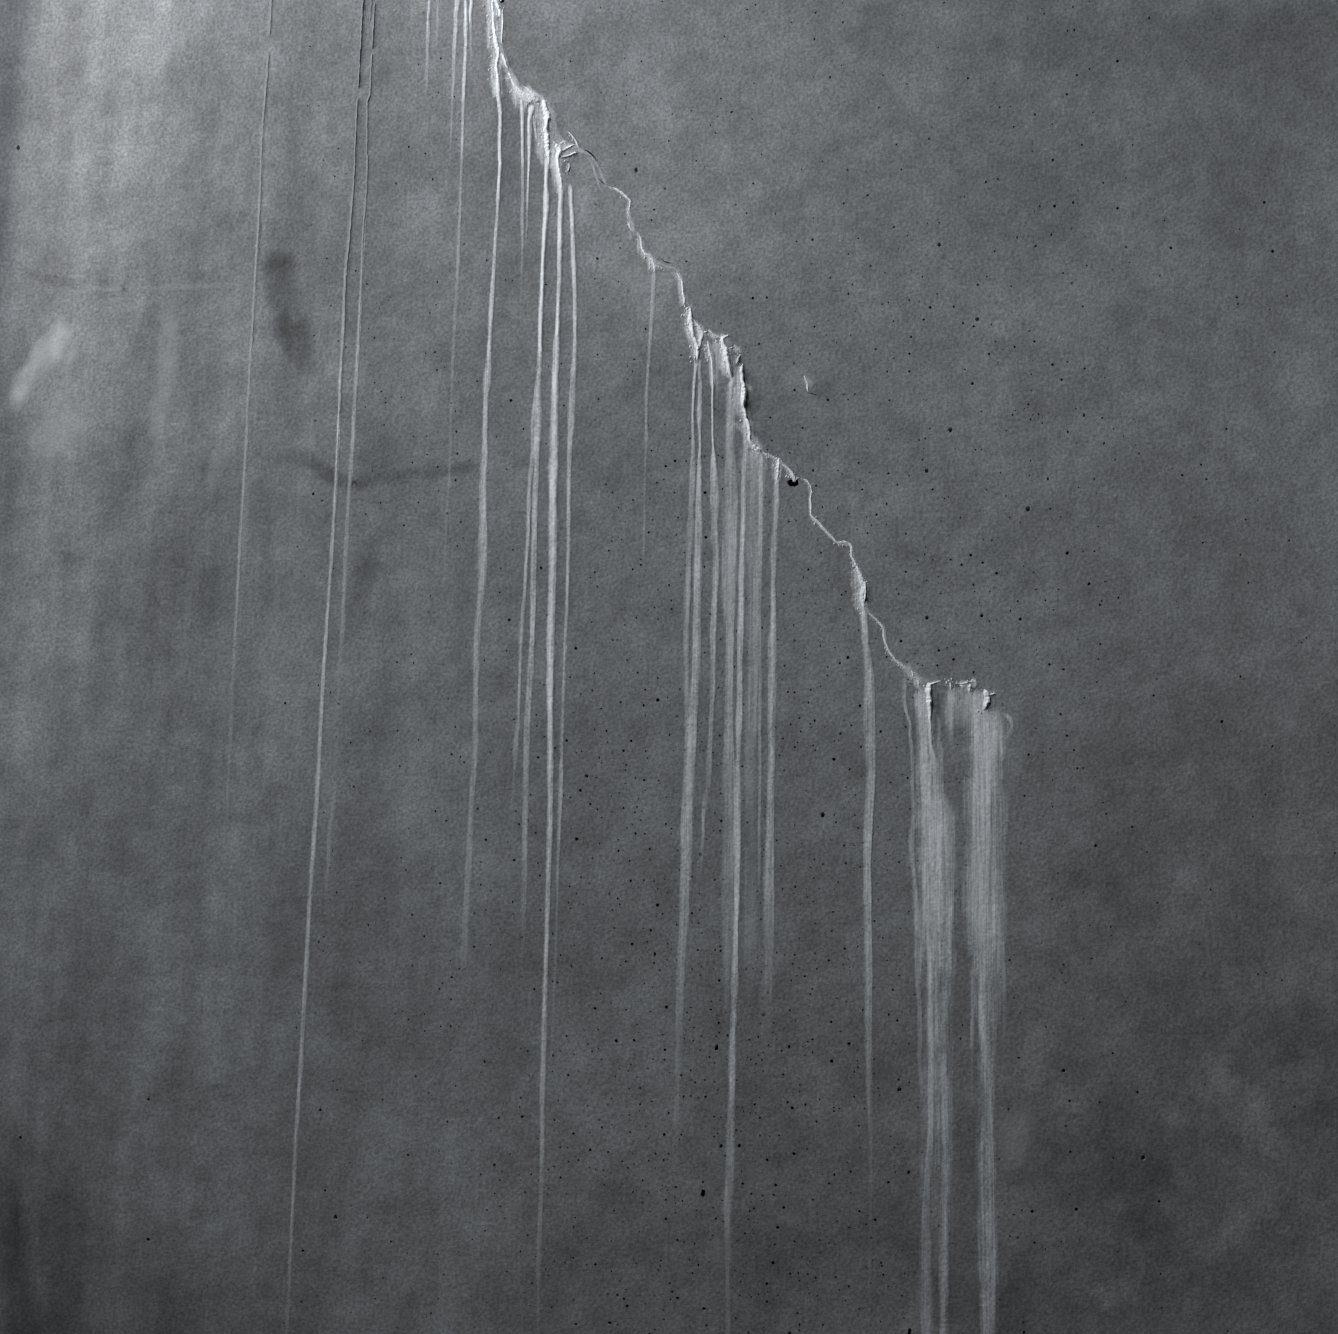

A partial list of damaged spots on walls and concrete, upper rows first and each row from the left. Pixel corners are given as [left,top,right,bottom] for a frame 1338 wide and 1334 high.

leakage [302,351,359,1012]
leakage [454,0,473,157]
leakage [477,79,502,620]
leakage [518,100,576,1108]
leakage [681,363,779,1107]
crack [483,0,996,740]
leakage [904,689,1013,1135]
leakage [980,1194,996,1333]